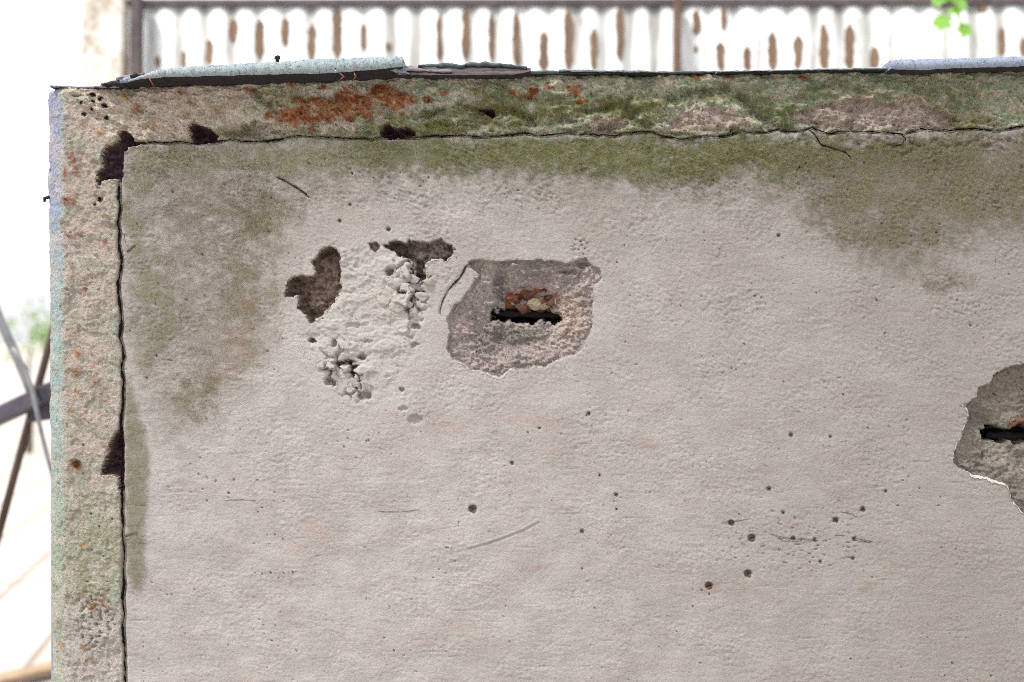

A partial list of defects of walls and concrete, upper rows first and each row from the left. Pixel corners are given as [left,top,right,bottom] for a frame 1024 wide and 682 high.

peeling [93,129,144,205]
rust [265,82,447,132]
rust [509,85,554,98]
crack [143,126,1024,159]
water stain [805,150,1024,260]
spalling [285,228,454,407]
spalling [446,257,602,379]
crack [116,181,137,682]
spalling [953,364,1024,514]